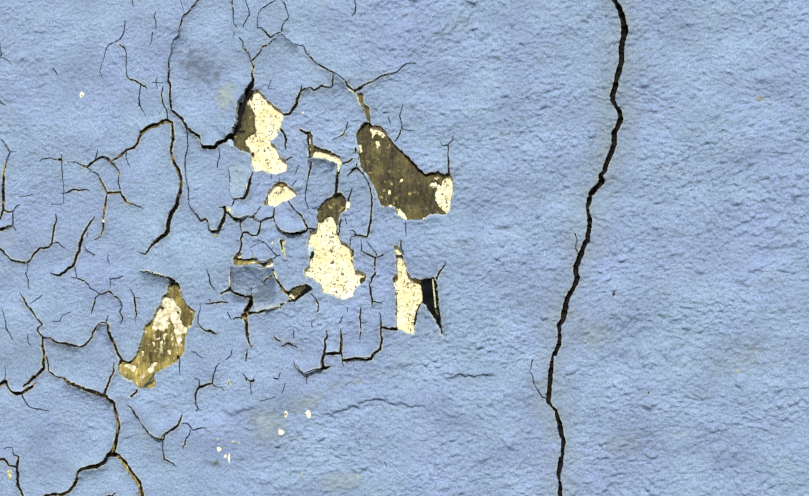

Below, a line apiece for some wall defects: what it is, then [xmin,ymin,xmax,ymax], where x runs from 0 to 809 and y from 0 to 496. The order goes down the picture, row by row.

peeling [227,89,297,207]
peeling [357,93,453,220]
crack [440,137,453,174]
peeling [118,281,195,388]
crack [0,0,416,496]
peeling [280,193,366,309]
peeling [393,246,443,334]
crack [529,0,629,496]